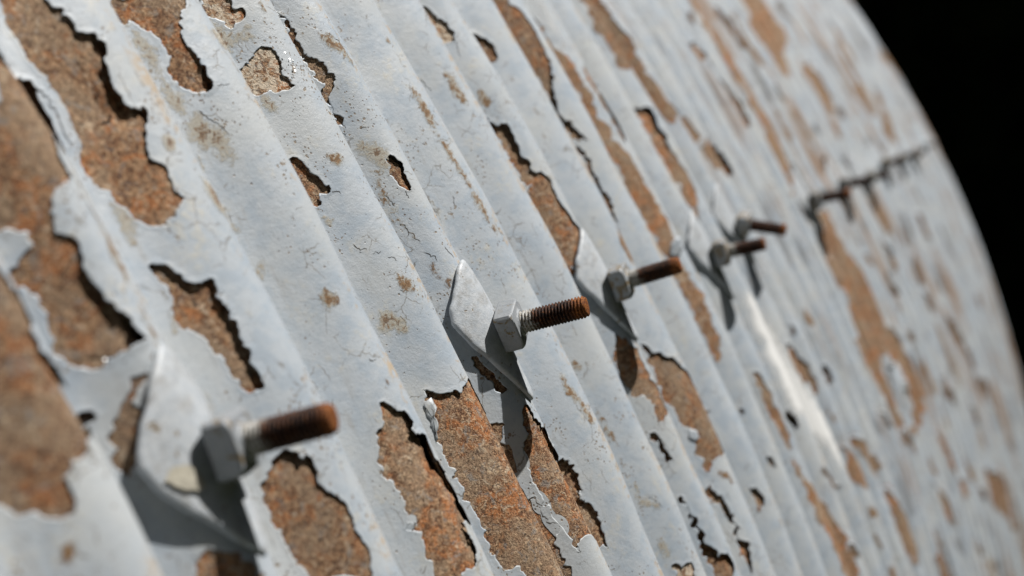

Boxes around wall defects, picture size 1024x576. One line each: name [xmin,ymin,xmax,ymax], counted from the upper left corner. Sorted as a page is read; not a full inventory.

peeling [0,0,190,525]
peeling [108,0,250,97]
peeling [145,258,271,399]
peeling [238,10,350,136]
peeling [485,0,735,364]
peeling [253,444,379,576]
peeling [368,353,610,576]
peeling [610,333,756,576]